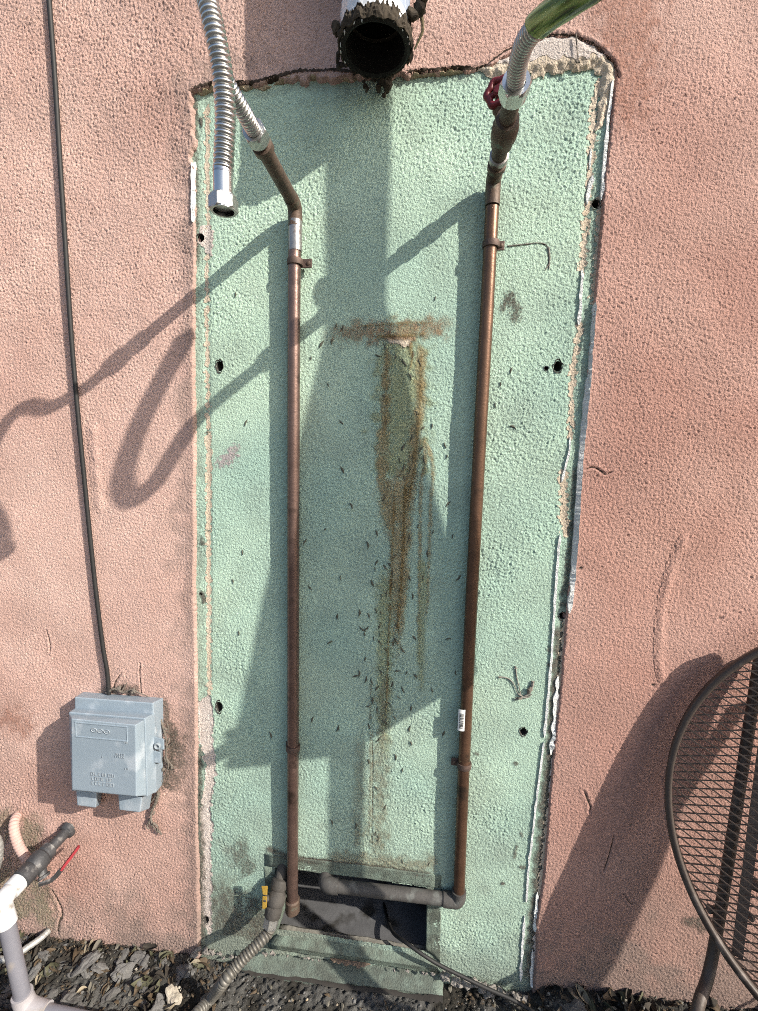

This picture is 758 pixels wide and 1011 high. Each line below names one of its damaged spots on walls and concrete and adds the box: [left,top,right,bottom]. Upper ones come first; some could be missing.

spalling [235,50,357,92]
corrosion [333,316,444,738]
peeling [393,36,615,1003]
leakage [163,701,185,789]
leakage [197,750,264,940]